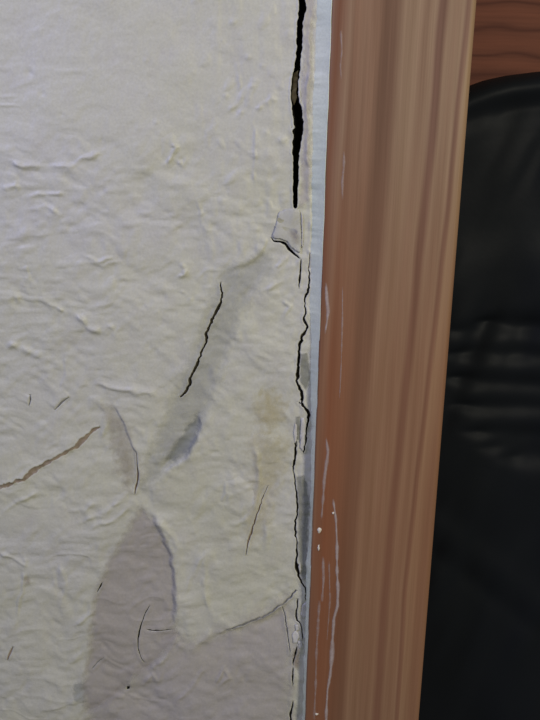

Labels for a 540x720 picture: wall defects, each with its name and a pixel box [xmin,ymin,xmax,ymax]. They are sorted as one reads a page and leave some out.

crack [288,0,309,209]
peeling [269,208,303,260]
crack [178,282,226,399]
crack [0,424,101,492]
flaking render [169,417,199,460]
crack [225,252,312,720]
spalling [84,512,175,709]